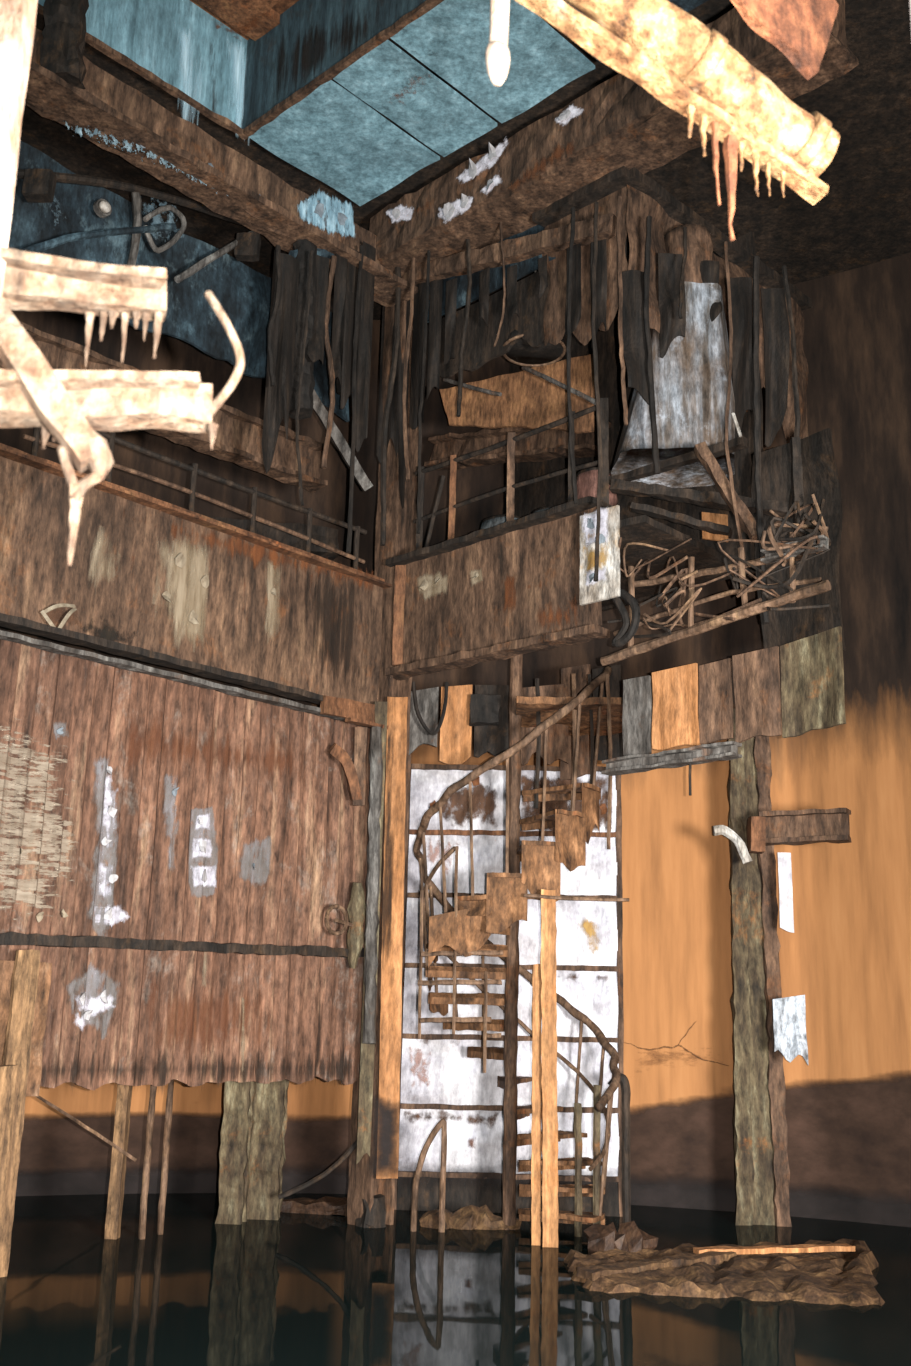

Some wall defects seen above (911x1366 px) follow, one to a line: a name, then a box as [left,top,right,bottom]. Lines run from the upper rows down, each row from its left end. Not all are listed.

peeling [89,760,128,936]
peeling [69,966,117,1039]